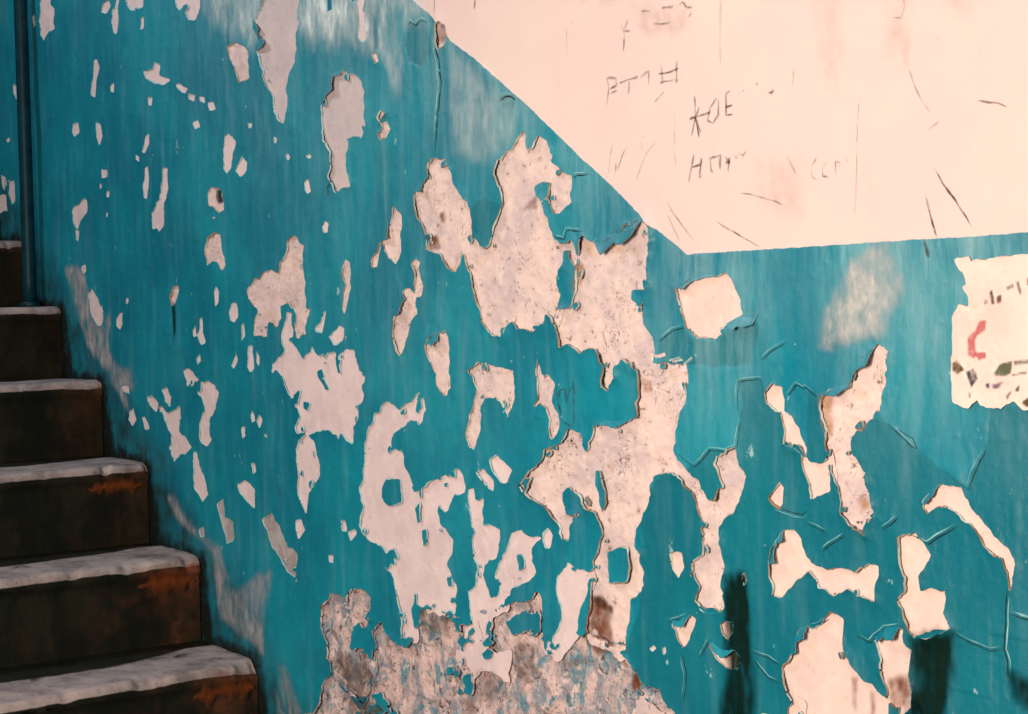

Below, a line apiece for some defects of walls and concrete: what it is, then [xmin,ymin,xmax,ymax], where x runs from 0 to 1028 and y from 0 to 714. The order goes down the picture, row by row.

peeling [136,134,168,231]
peeling [227,0,299,124]
peeling [320,67,390,196]
crack [390,2,441,145]
peeling [204,232,225,270]
peeling [129,317,234,544]
peeling [214,131,758,714]
peeling [764,343,888,536]
peeling [768,529,879,602]
peeling [782,532,950,714]
peeling [922,483,1015,591]
crack [958,593,1028,678]